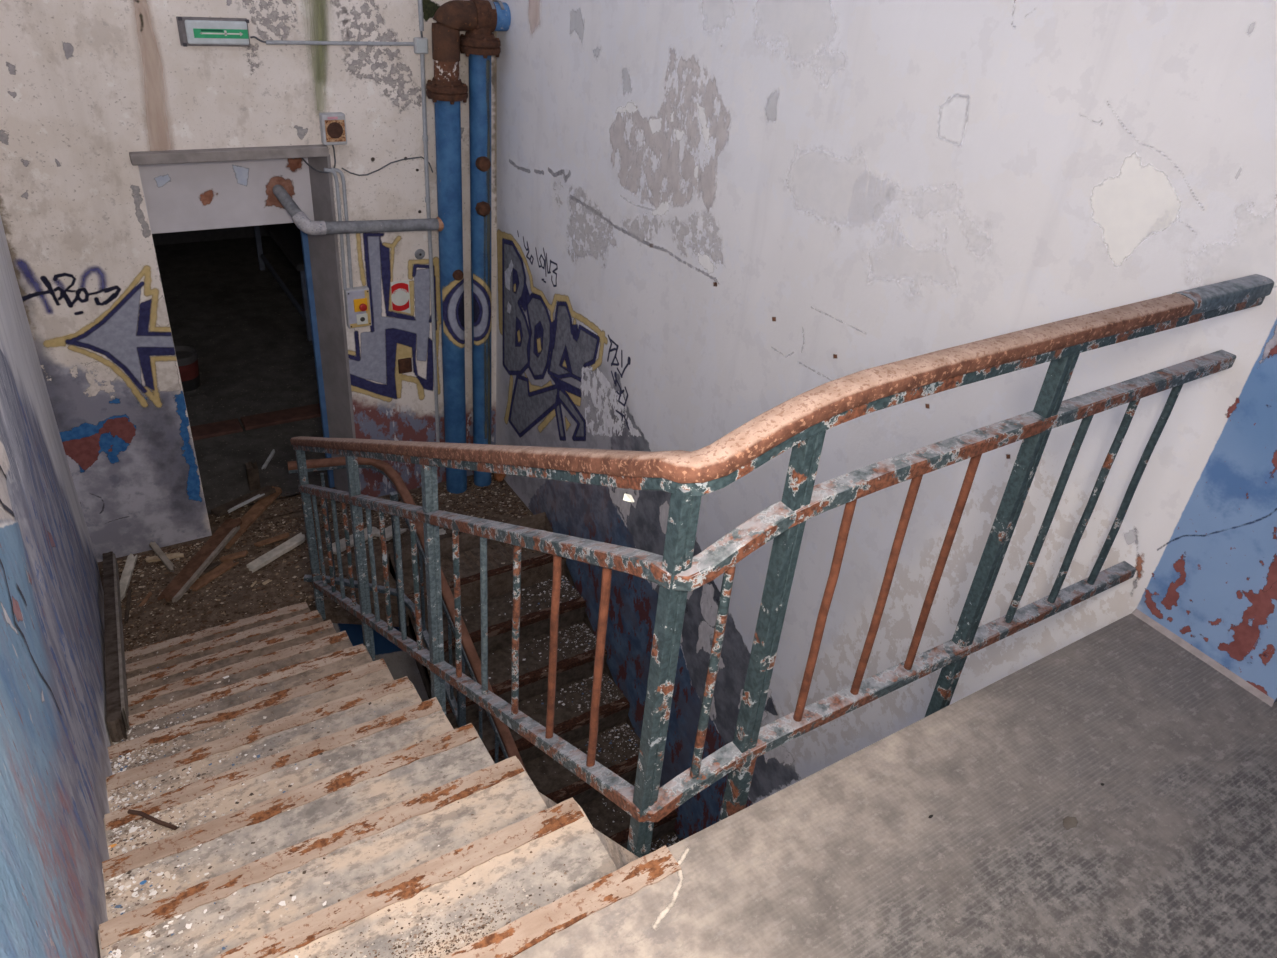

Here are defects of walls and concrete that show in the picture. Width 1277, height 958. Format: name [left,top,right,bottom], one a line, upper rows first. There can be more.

rust [134,0,170,151]
peeling [227,0,296,75]
leakage [309,0,324,110]
peeling [331,0,422,111]
spalling [554,49,730,274]
peeling [1192,210,1277,285]
peeling [60,361,136,473]
peeling [155,361,202,502]
peeling [608,487,639,526]
crack [1125,508,1277,588]
peeling [680,580,725,673]
peeling [1145,552,1277,666]